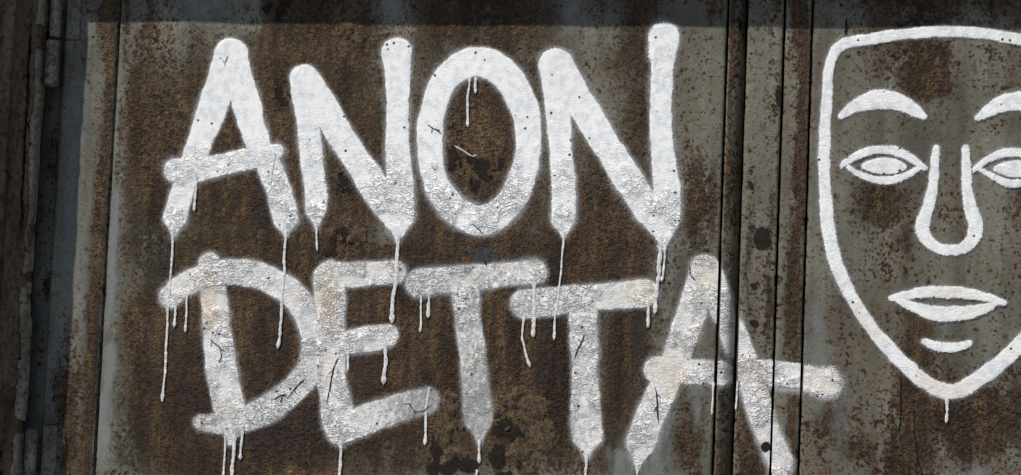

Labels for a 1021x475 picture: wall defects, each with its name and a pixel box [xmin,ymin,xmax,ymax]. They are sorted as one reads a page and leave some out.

rust [843,0,1020,103]
peeling [14,48,46,421]
rust [50,0,738,475]
rust [743,0,809,363]
rust [847,172,916,259]
rust [897,307,971,384]
leakage [649,420,669,475]
rust [661,387,767,475]
rust [811,358,1021,475]